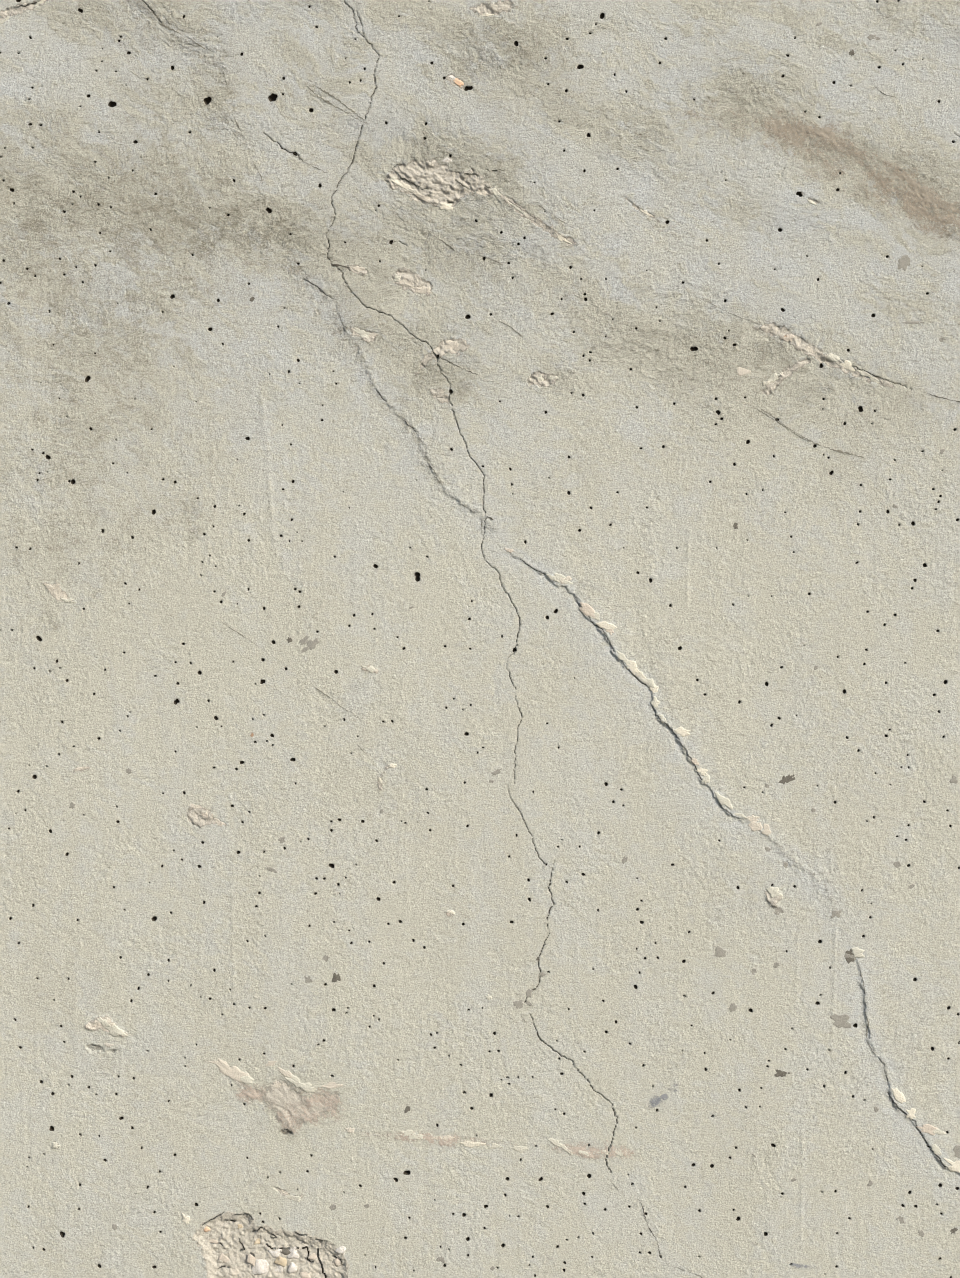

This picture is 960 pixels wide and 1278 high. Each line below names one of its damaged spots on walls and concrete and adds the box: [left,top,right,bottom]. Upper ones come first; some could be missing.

crack [160,23,228,88]
peeling [384,157,576,246]
crack [852,366,960,402]
crack [234,4,702,1278]
crack [860,970,875,1054]
peeling [208,1058,343,1129]
spalling [182,1211,350,1278]